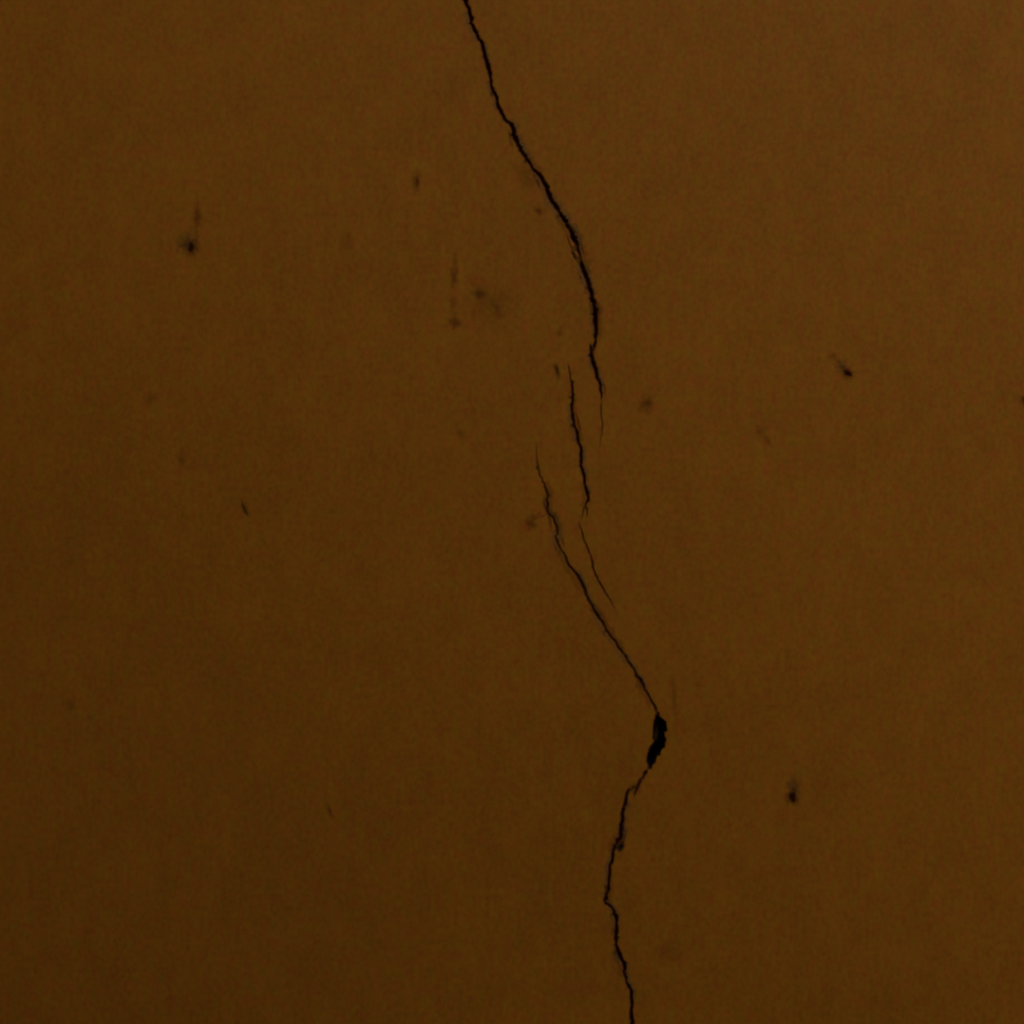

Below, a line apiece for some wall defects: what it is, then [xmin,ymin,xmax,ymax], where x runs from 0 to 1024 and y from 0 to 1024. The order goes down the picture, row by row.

crack [461,0,658,715]
crack [602,767,649,1024]